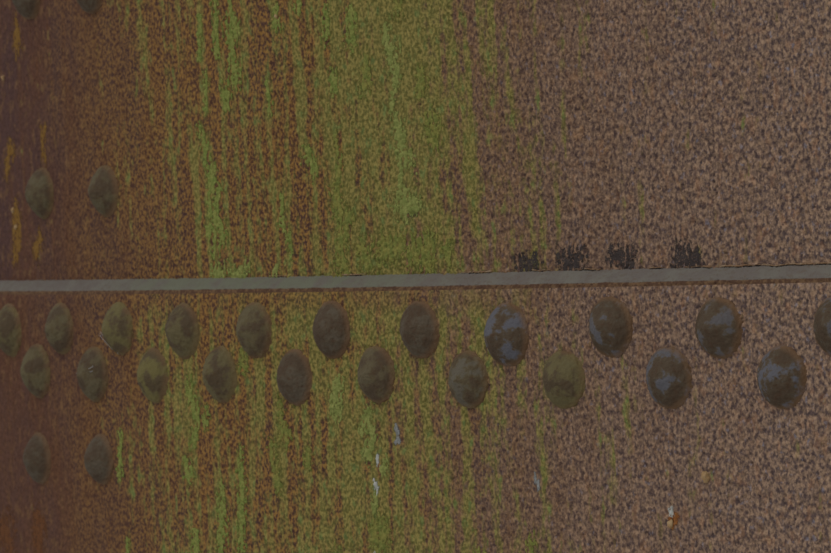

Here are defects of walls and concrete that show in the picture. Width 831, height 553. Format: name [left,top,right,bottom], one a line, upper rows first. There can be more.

corrosion [11,197,22,268]